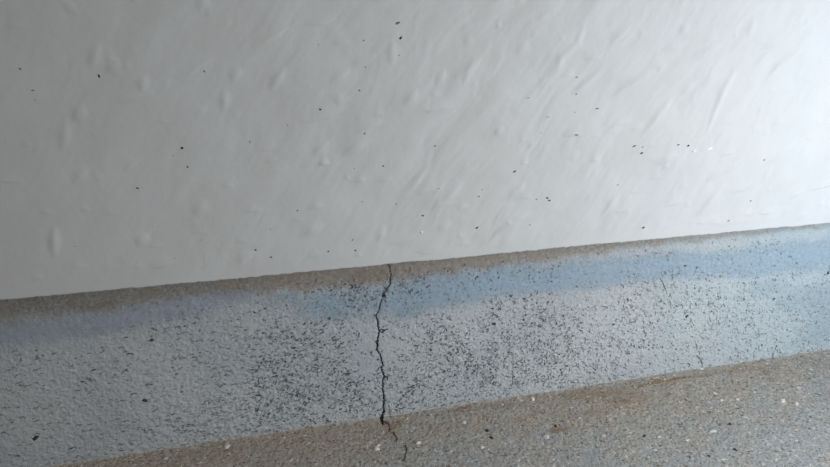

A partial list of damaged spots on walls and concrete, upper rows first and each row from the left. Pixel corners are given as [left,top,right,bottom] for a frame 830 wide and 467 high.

crack [374,265,407,460]